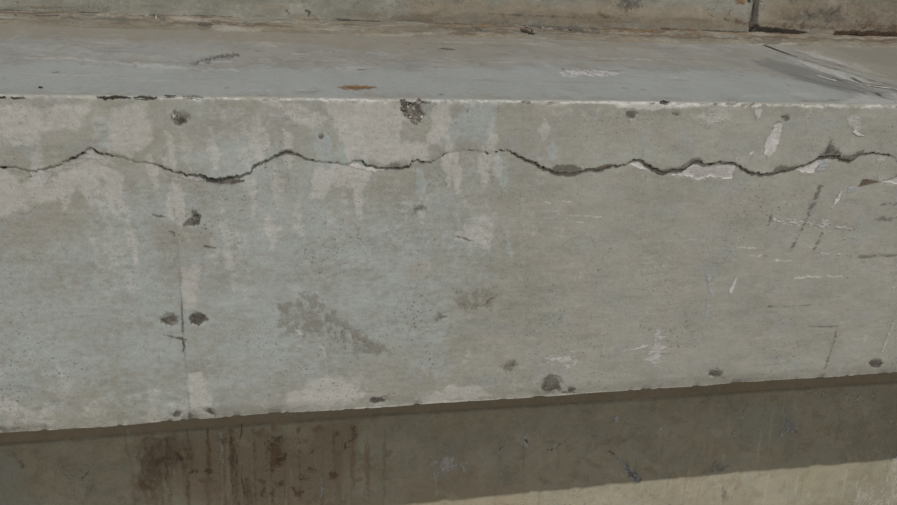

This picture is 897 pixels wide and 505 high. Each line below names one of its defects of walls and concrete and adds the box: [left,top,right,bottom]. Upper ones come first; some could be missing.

crack [662,0,897,100]
spalling [171,110,188,126]
spalling [400,98,431,124]
peeling [749,116,789,157]
crack [155,149,332,184]
crack [470,149,891,186]